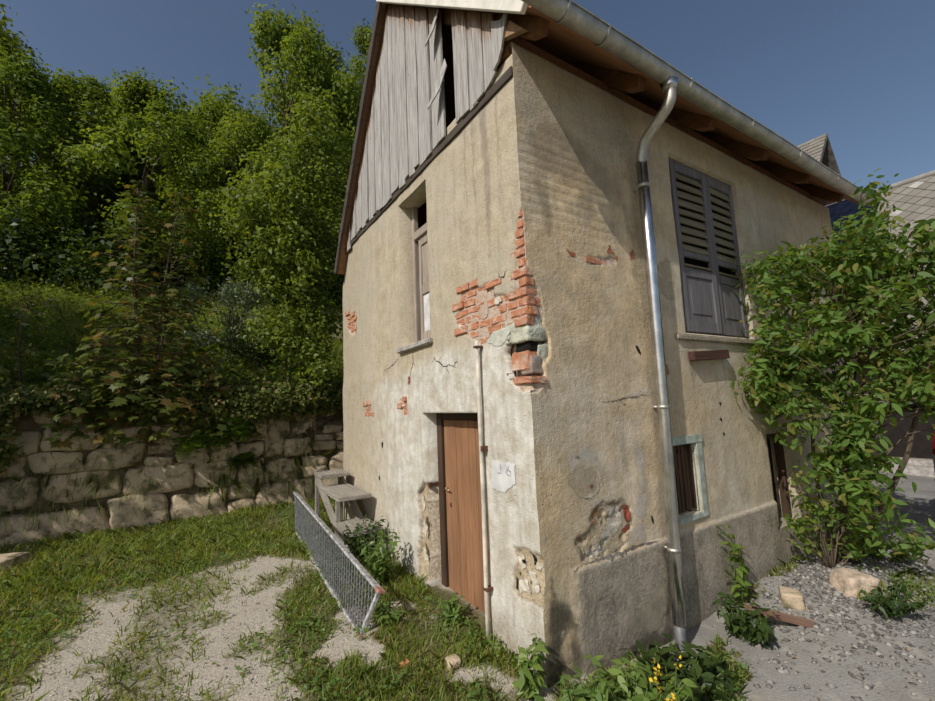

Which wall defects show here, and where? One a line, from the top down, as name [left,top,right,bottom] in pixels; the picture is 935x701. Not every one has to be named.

flaking render [566,245,618,266]
flaking render [452,209,549,393]
flaking render [397,396,409,415]
crack [601,390,647,405]
flaking render [419,485,431,579]
flaking render [570,472,658,572]
flaking render [515,549,545,607]
water stain [546,603,581,688]